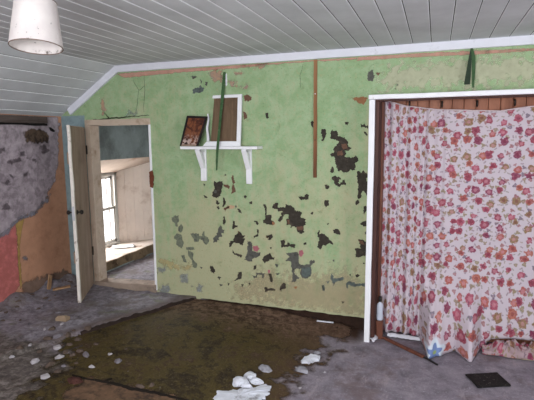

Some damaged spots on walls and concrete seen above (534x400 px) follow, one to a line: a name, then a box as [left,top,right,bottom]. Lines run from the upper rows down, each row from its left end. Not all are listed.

peeling [119,48,534,94]
crack [93,83,149,120]
peeling [321,129,368,214]
flaking render [0,116,60,302]
peeling [172,174,242,269]
peeling [210,203,315,292]
peeling [317,230,333,250]
peeling [355,221,366,257]
peeling [322,274,365,291]